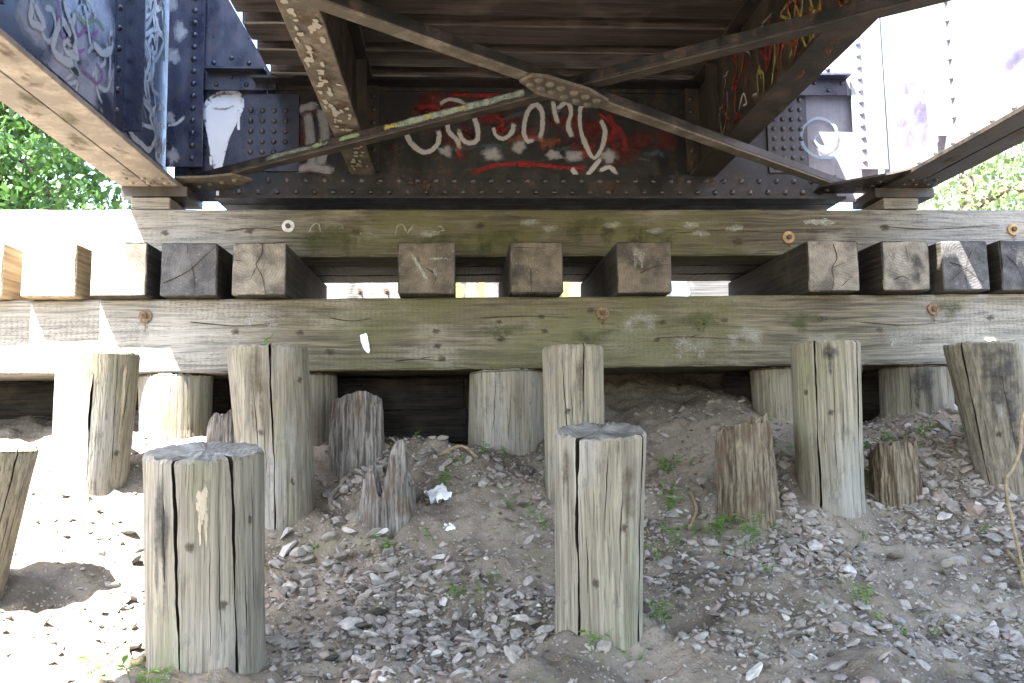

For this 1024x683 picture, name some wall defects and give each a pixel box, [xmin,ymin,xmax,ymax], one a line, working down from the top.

peeling [280,0,353,133]
crack [163,244,211,296]
crack [227,228,276,294]
crack [811,231,852,291]
crack [813,322,946,513]
crack [910,343,1019,484]
crack [162,458,184,670]
crack [191,322,298,673]
crack [562,343,643,642]